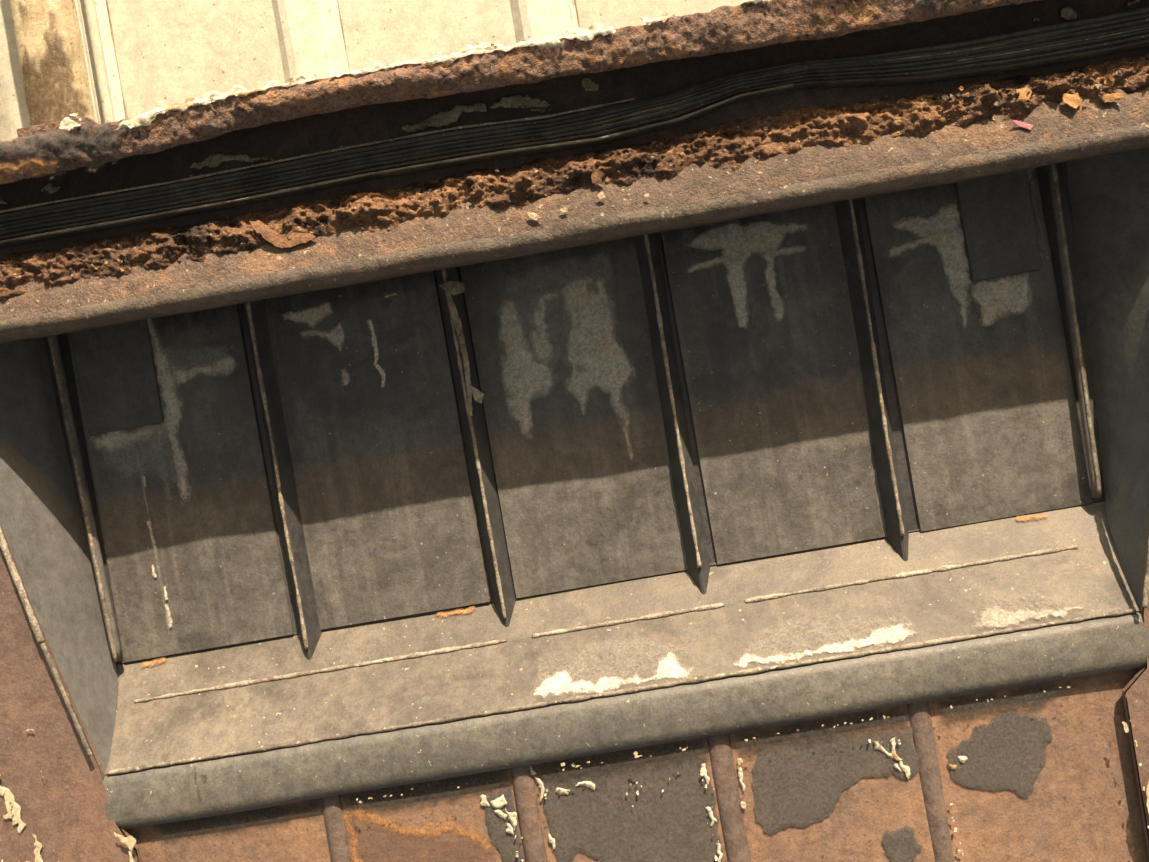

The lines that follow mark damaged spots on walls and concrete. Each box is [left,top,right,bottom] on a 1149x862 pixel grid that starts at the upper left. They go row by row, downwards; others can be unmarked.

rust [0,0,1042,185]
rust [0,52,1149,301]
leakage [688,221,806,327]
leakage [890,205,1029,325]
leakage [500,253,632,441]
leakage [534,641,692,696]
leakage [734,617,913,666]
peeling [0,775,43,862]
peeling [114,832,136,862]
peeling [480,795,523,862]
peeling [530,761,603,801]
peeling [868,737,910,779]